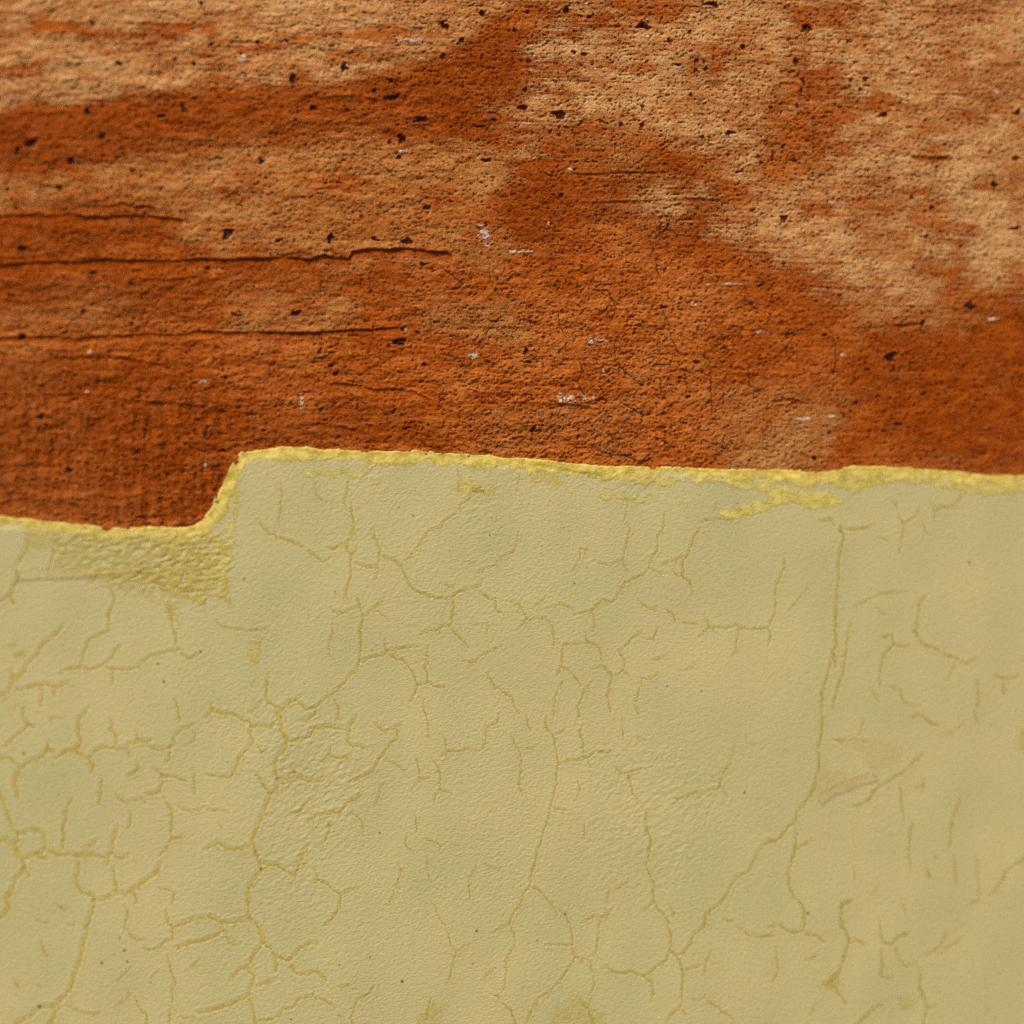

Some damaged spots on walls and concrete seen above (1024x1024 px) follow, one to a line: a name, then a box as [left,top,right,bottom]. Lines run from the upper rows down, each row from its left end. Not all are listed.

hole [337,79,400,112]
hole [14,139,37,155]
spalling [912,143,953,162]
spalling [0,203,183,227]
spalling [0,234,452,286]
spalling [0,321,427,399]
crack [879,596,978,685]
crack [0,467,936,1024]